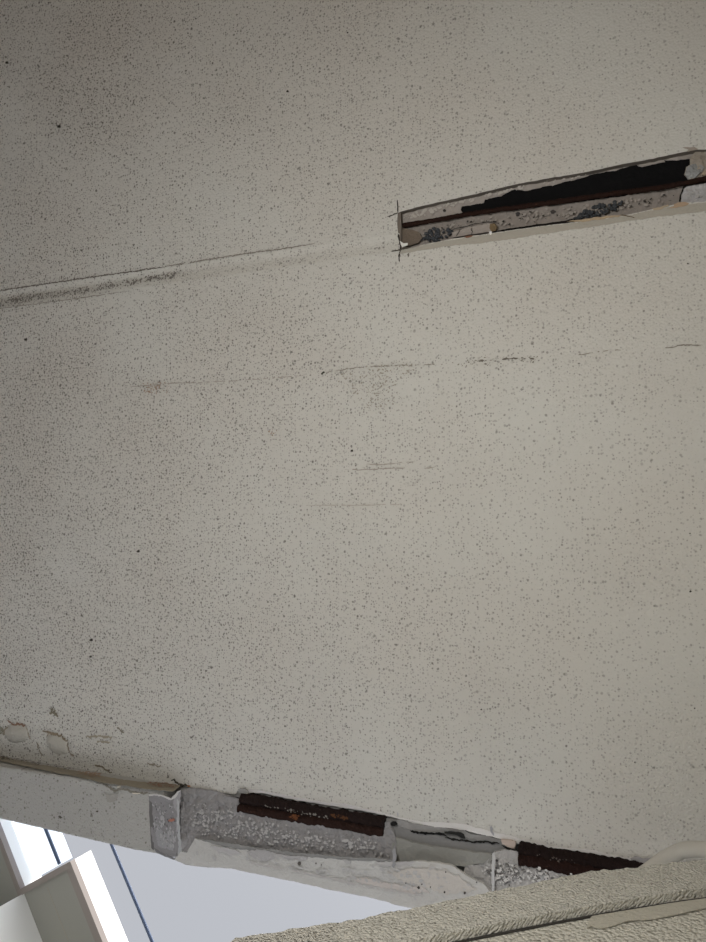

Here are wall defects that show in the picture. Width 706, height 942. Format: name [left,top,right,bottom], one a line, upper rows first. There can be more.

spalling [397,147,706,257]
crack [0,243,314,309]
crack [3,720,148,795]
crack [147,763,187,787]
spalling [132,786,650,908]